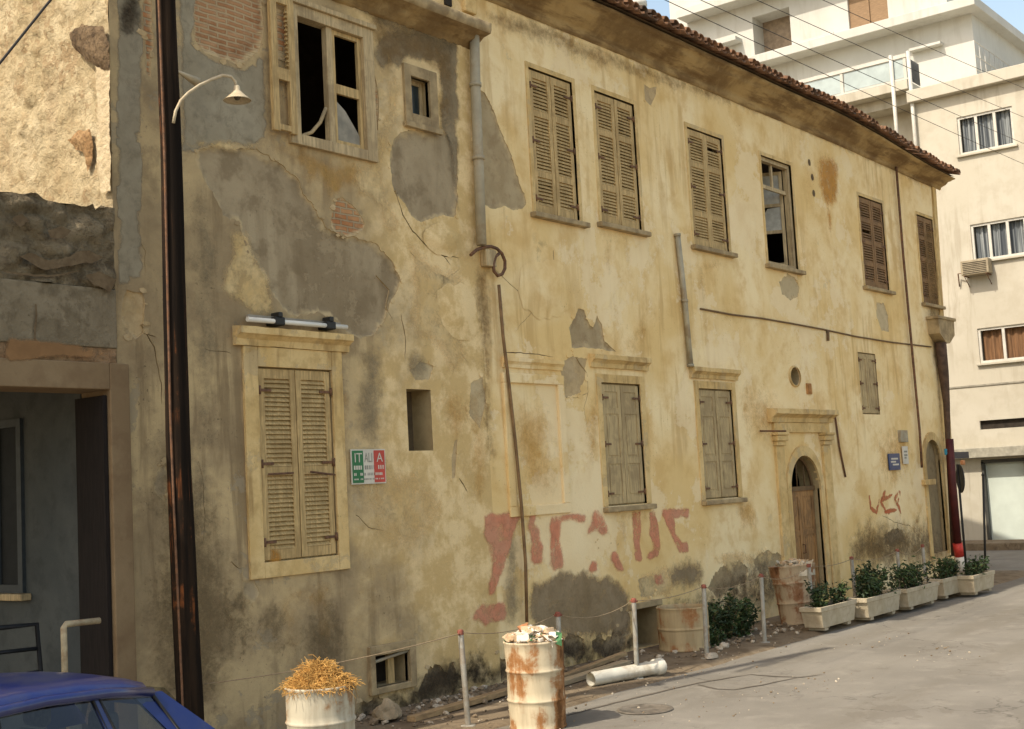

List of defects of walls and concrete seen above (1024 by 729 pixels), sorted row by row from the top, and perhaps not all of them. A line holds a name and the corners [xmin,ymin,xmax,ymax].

flaking render [192,0,286,68]
peeling [68,24,111,193]
flaking render [375,81,459,224]
flaking render [471,91,526,210]
peeling [20,250,103,270]
flaking render [194,142,405,338]
flaking render [560,309,614,401]
water stain [855,530,941,564]
water stain [564,636,633,665]